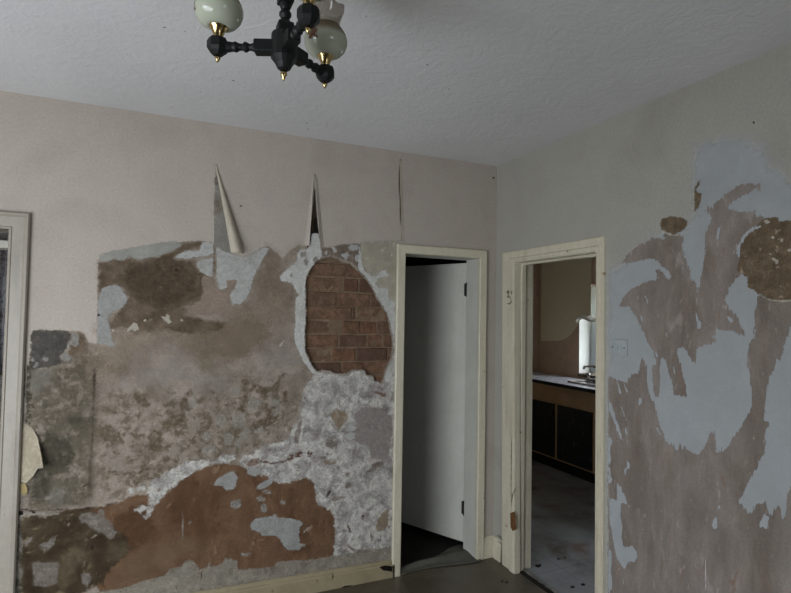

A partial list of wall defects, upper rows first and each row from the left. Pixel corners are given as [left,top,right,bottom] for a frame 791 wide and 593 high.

damp [17,241,293,593]
flaking render [63,233,396,592]
peeling [608,437,637,593]
flaking render [737,217,791,302]